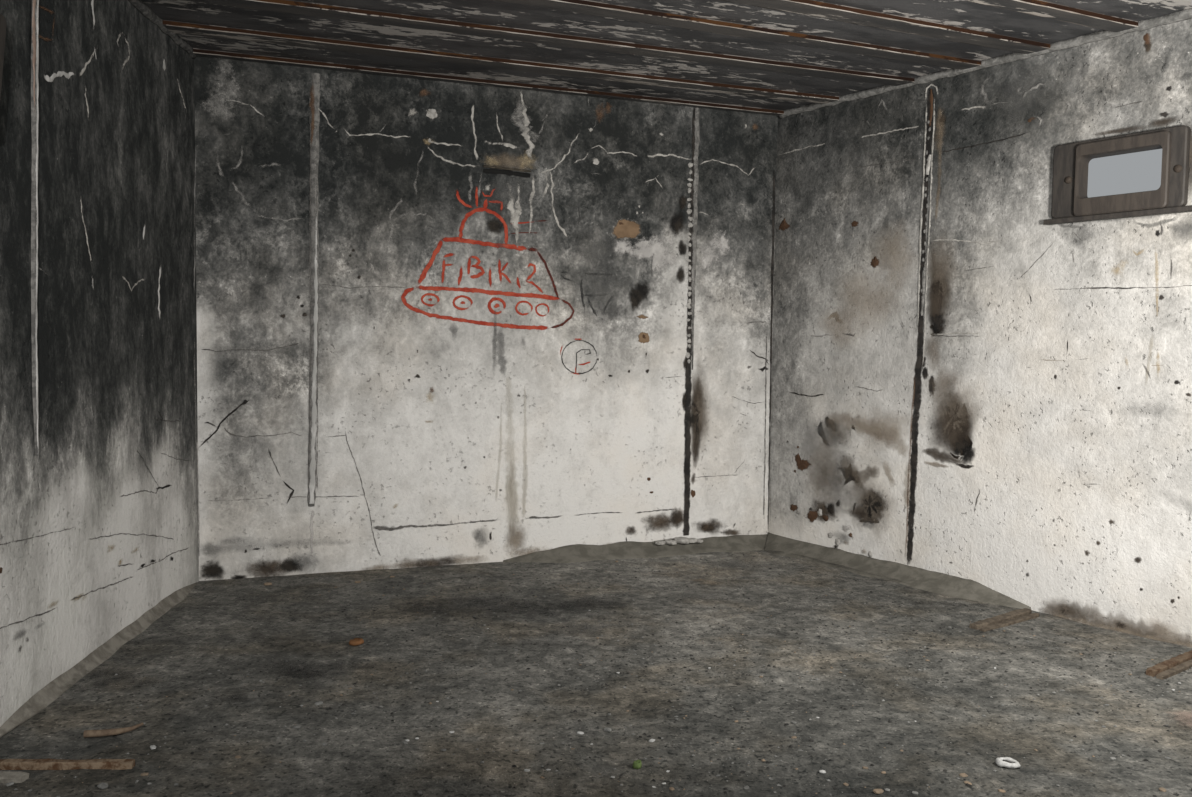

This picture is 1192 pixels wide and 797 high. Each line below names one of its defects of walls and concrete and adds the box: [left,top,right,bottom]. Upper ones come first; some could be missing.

crack [121,400,379,553]
water stain [672,510,684,527]
water stain [690,383,705,497]
water stain [843,459,891,519]
water stain [925,378,974,469]
water stain [1044,606,1192,647]